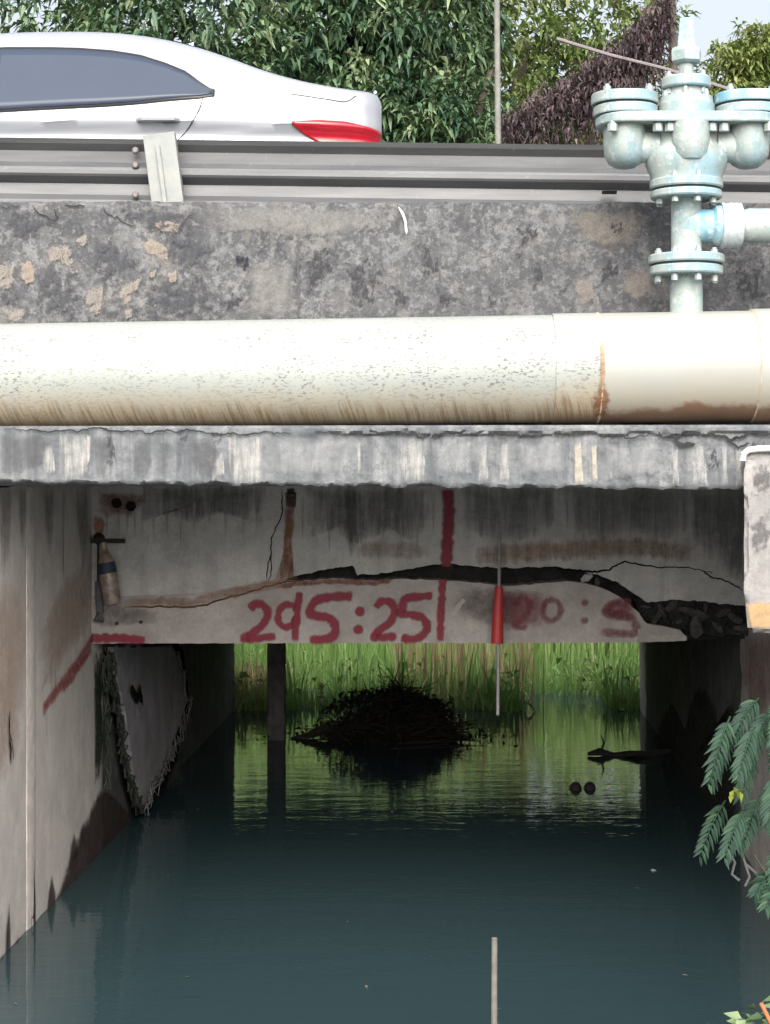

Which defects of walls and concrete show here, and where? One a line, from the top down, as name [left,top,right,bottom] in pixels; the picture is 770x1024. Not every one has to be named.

rust [593,352,610,417]
crack [128,488,304,608]
rust [224,505,390,596]
water stain [280,440,340,472]
water stain [319,488,409,543]
water stain [438,443,470,471]
water stain [522,442,560,470]
water stain [575,445,670,537]
crack [558,561,743,591]
water stain [695,497,770,568]
water stain [753,465,770,491]
spalling [631,595,749,639]